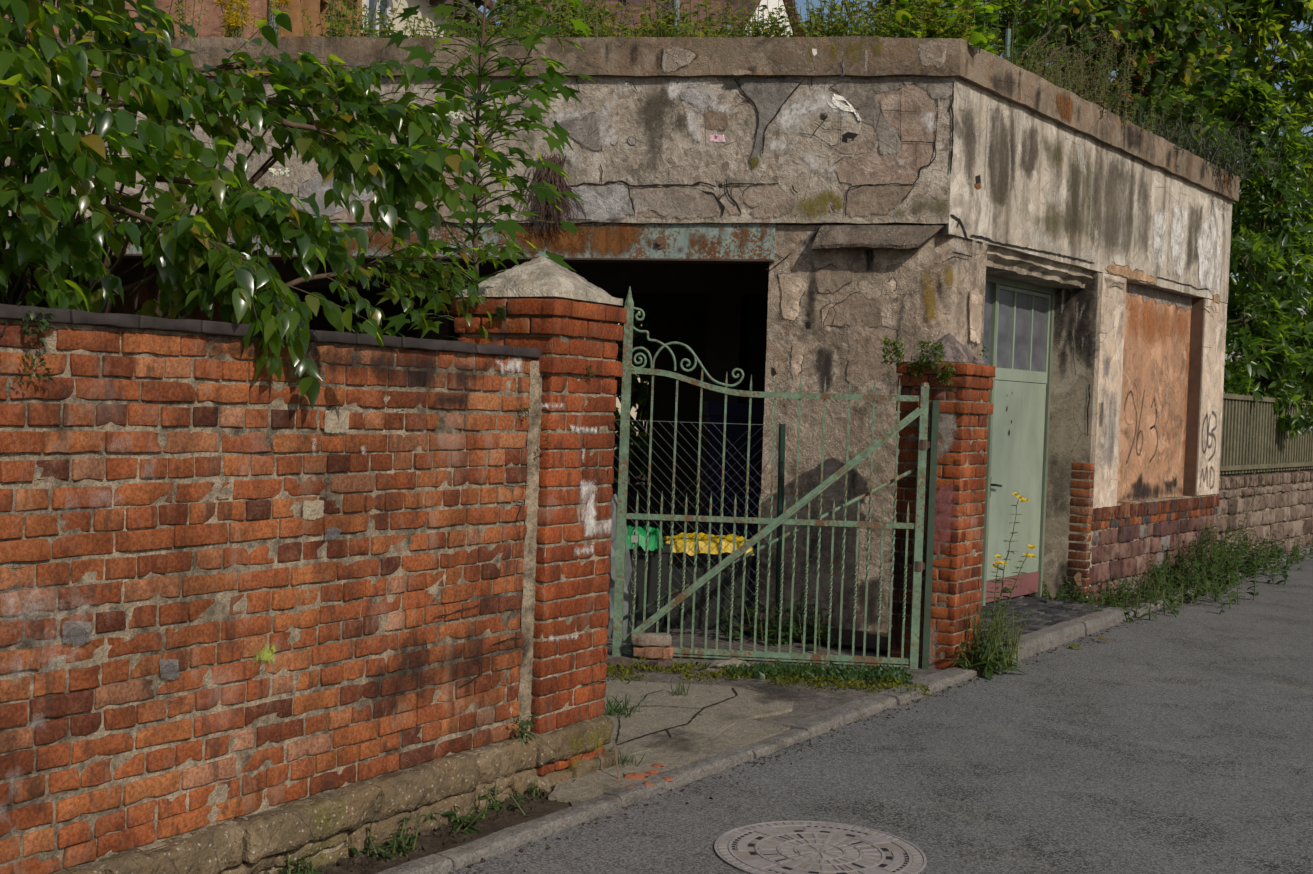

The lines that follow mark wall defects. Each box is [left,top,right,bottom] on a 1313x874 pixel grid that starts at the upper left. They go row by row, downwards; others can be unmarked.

crack [568,60,843,216]
crack [830,82,954,218]
damp [957,63,1221,291]
rust [341,229,420,252]
rust [515,223,652,258]
rust [680,227,722,256]
damp [1054,278,1110,375]